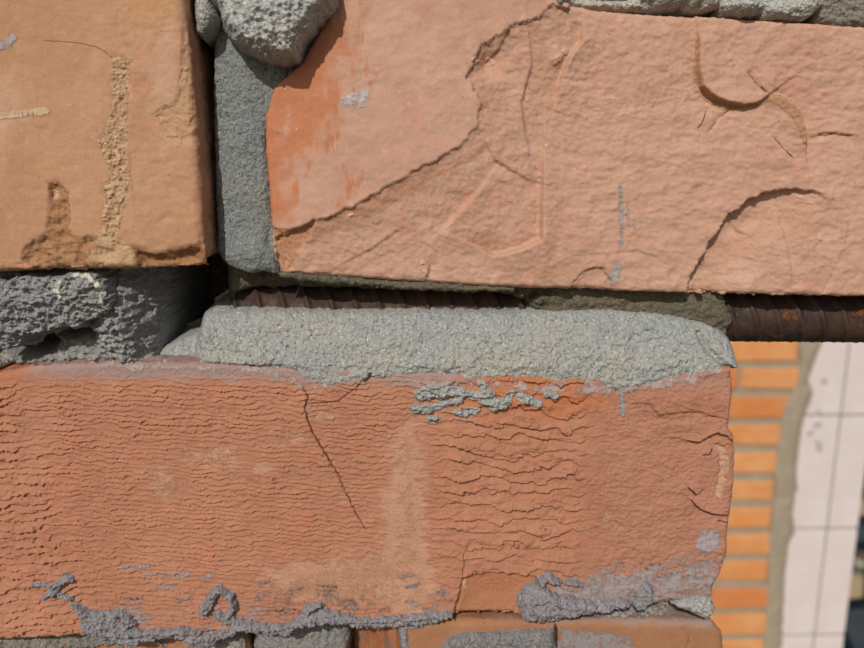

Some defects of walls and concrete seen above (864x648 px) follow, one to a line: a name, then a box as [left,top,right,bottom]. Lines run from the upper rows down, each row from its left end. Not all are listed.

spalling [20,41,208,270]
spalling [273,3,612,290]
spalling [687,188,850,295]
crack [303,372,372,528]
crack [551,623,559,648]